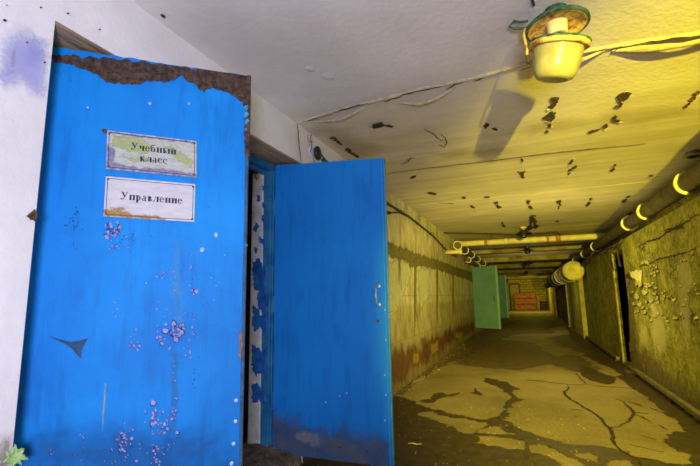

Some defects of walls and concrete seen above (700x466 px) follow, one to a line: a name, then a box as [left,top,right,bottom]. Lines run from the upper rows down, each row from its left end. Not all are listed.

corrosion [51,54,251,157]
spalling [542,97,559,133]
spalling [588,91,632,134]
spalling [525,200,539,231]
peeling [245,185,270,336]
crack [614,214,699,353]
peeling [626,260,700,323]
peeling [251,344,269,404]
damp [393,254,700,466]
crack [533,374,668,466]
damp [300,457,375,466]